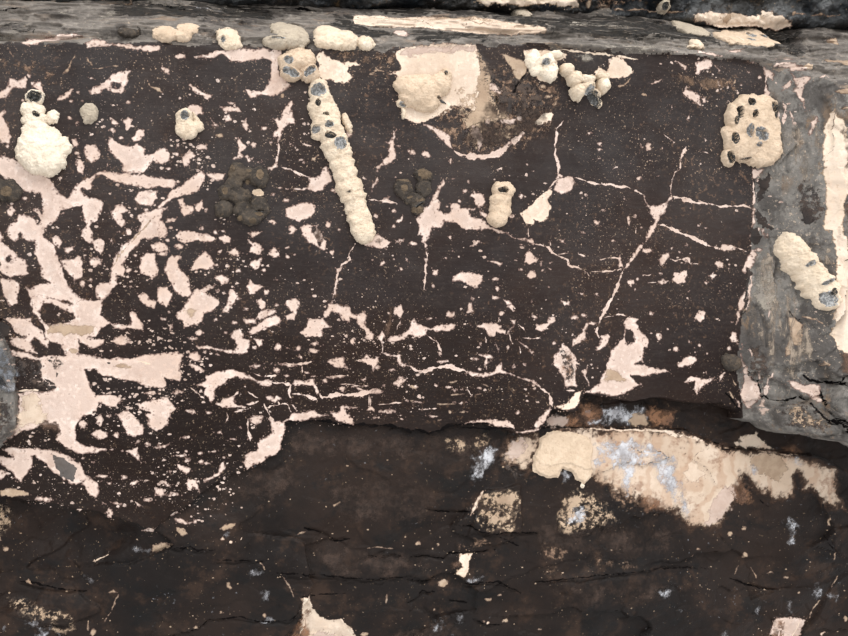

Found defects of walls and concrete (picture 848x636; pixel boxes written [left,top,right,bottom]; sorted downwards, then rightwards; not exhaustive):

peeling [21,29,164,53]
peeling [353,0,579,125]
crack [506,120,752,338]
crack [331,243,356,304]
peeling [0,45,826,564]
crack [380,351,553,407]
crack [285,419,513,435]
leakage [594,438,687,512]
crack [171,508,705,636]
leakage [544,543,568,560]
peeling [277,576,369,636]
peeling [753,600,820,636]